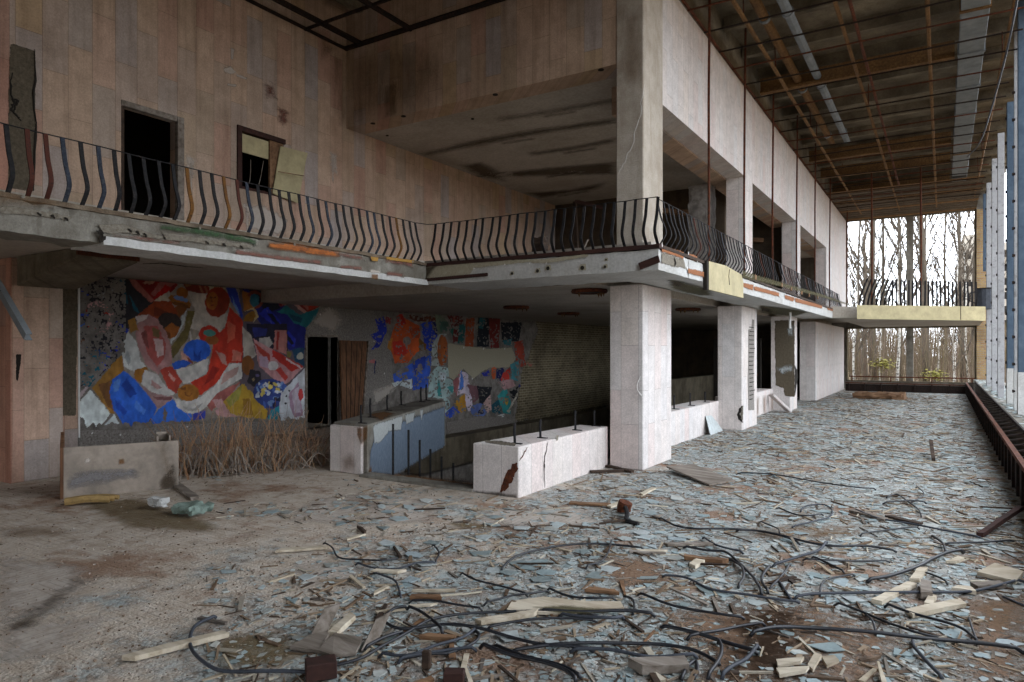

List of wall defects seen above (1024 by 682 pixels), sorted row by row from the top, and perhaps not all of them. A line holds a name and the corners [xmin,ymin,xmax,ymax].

leakage [428,121,610,154]
leakage [467,163,614,197]
flaking render [135,225,588,278]
spalling [662,244,704,277]
flaking render [370,321,610,475]
crack [500,443,548,492]